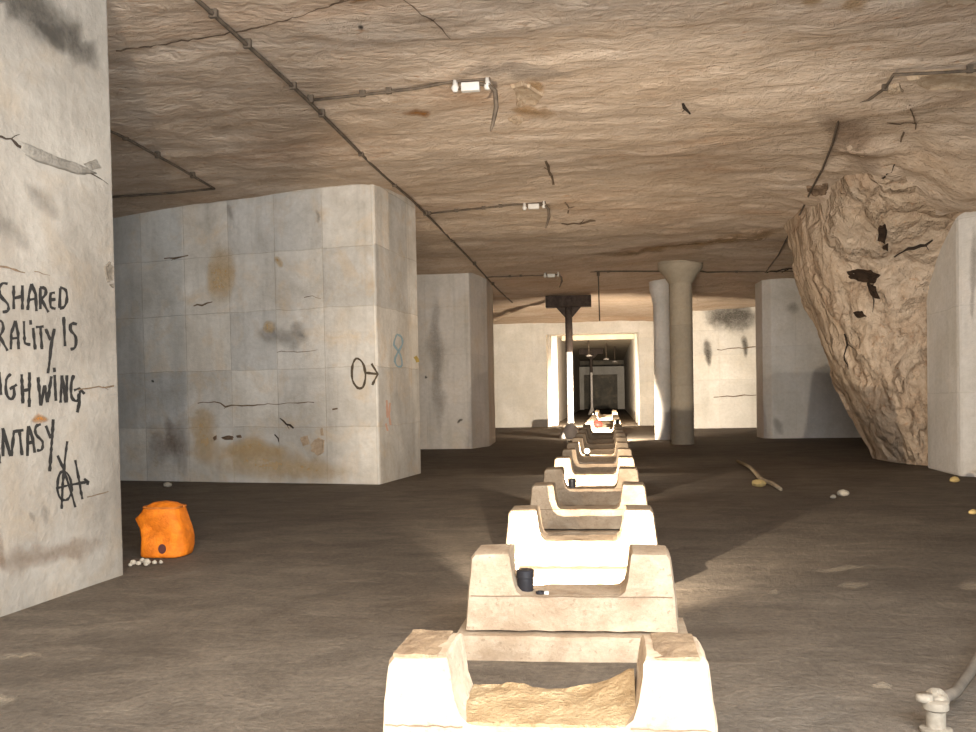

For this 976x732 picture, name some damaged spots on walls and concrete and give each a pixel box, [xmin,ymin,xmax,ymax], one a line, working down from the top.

leakage [1,0,91,60]
crack [116,0,352,52]
crack [404,0,450,39]
crack [0,134,21,148]
spalling [877,224,888,251]
spalling [847,269,880,299]
leakage [710,308,752,327]
crack [199,401,338,442]